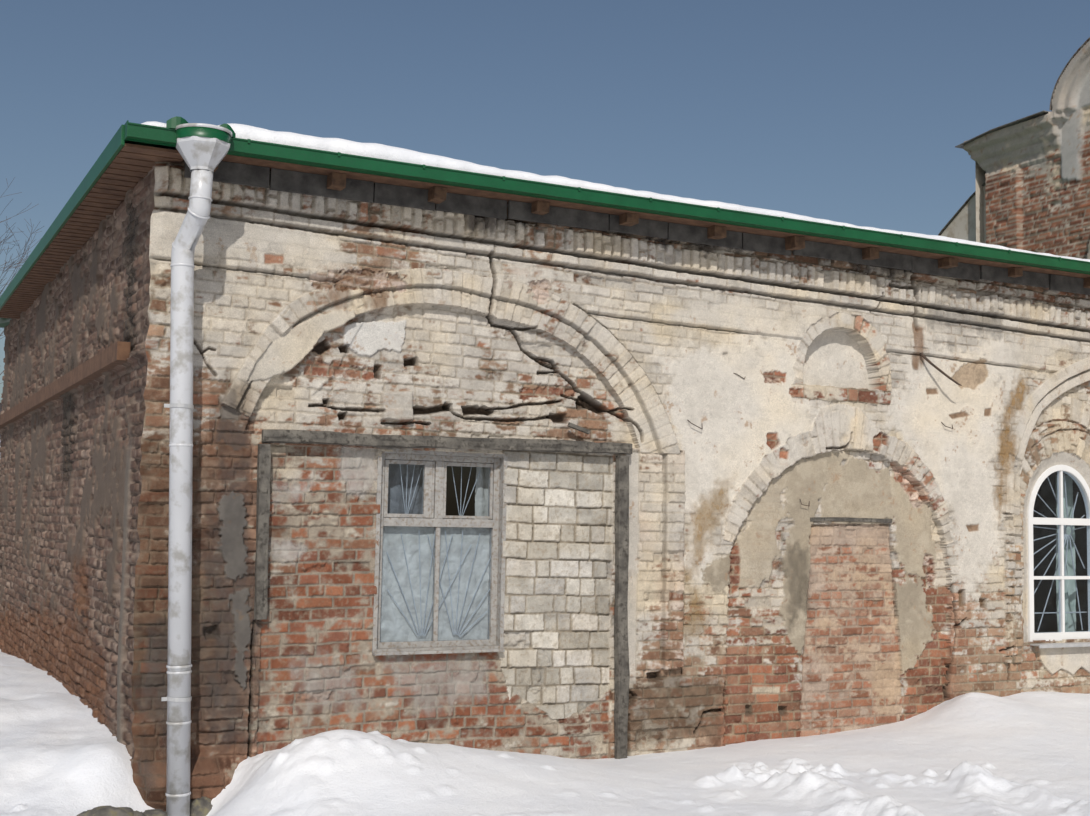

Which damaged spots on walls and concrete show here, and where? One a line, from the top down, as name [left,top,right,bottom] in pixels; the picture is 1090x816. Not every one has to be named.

flaking render [304,318,408,383]
crack [308,249,645,444]
spalling [461,405,498,416]
flaking render [519,382,604,424]
flaking render [763,370,802,396]
flaking render [951,357,989,390]
spalling [890,461,934,508]
damp [695,489,724,556]
spalling [728,542,742,595]
spalling [922,552,938,589]
peeling [203,586,253,692]
spalling [646,671,663,682]